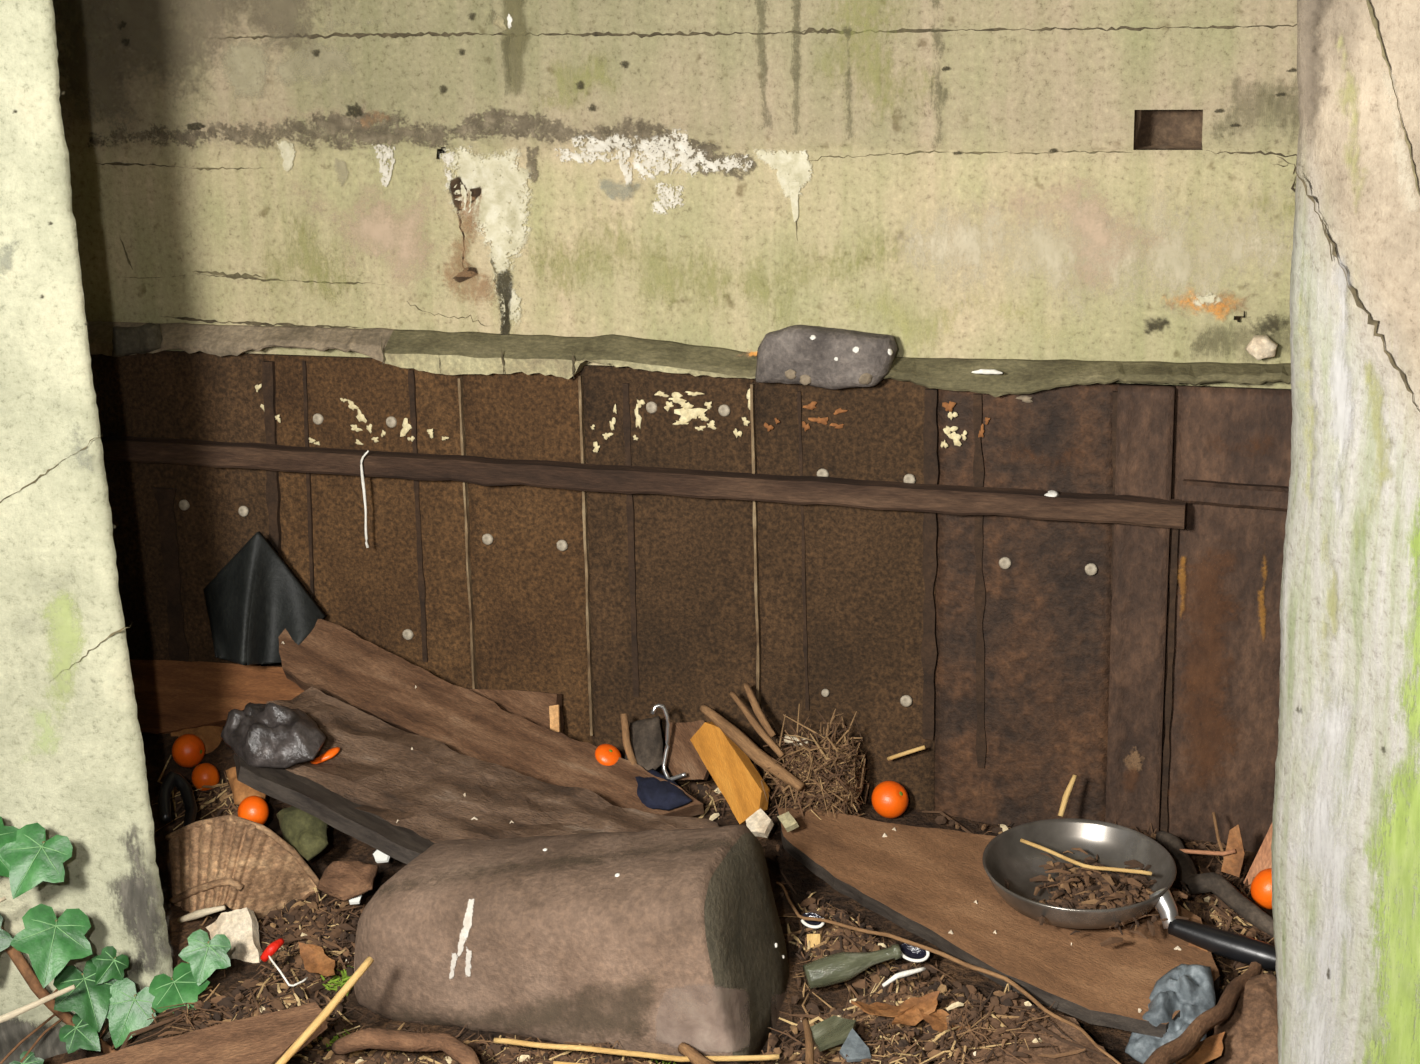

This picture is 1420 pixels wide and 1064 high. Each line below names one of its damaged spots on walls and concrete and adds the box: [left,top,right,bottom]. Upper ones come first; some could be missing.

damp [53,0,312,120]
damp [504,0,528,87]
efflorescence [556,129,812,241]
crack [807,150,1131,161]
corrosion [1180,293,1229,318]
crack [1206,150,1420,412]
damp [1364,503,1420,1064]